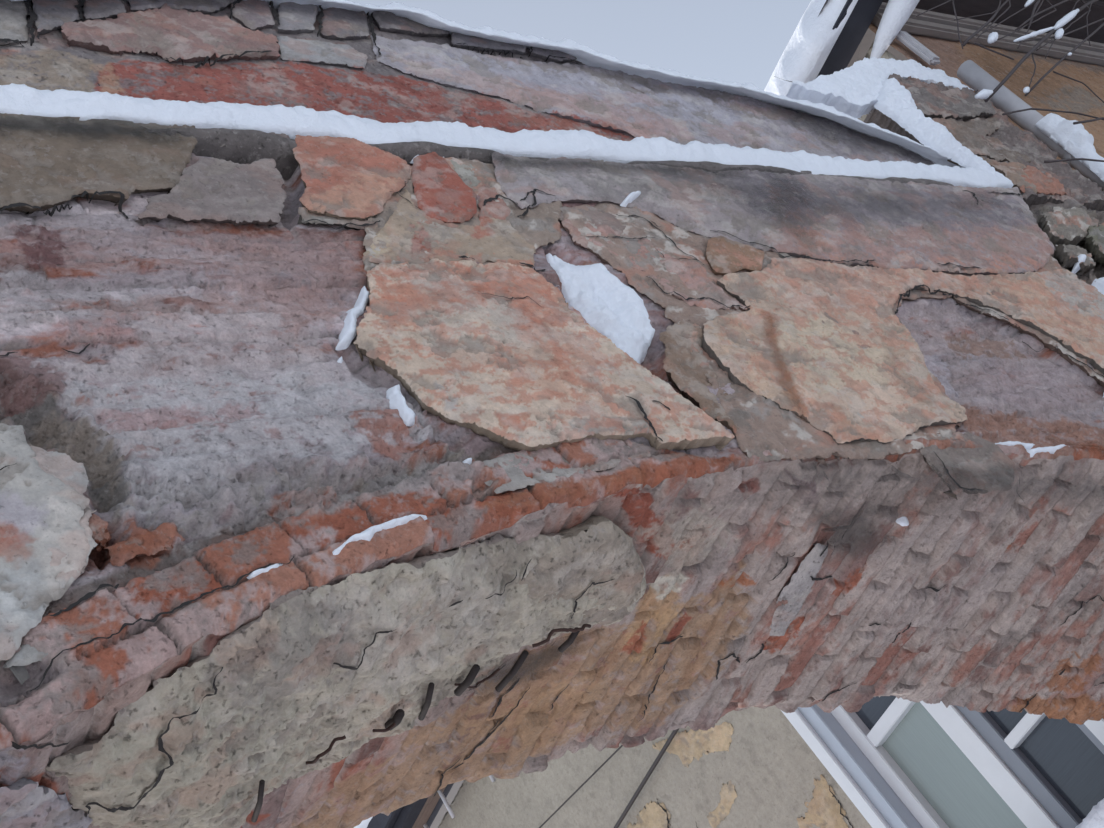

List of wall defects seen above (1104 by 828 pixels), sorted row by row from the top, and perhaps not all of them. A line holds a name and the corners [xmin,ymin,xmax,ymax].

crack [0,0,38,47]
crack [0,191,129,219]
flaking render [0,87,1104,499]
crack [895,261,1104,377]
crack [30,556,294,691]
crack [333,630,395,670]
crack [12,741,68,750]
crack [85,667,223,814]
crack [433,678,530,797]
peeling [652,722,734,768]
peeling [627,801,671,828]
peeling [796,774,848,828]